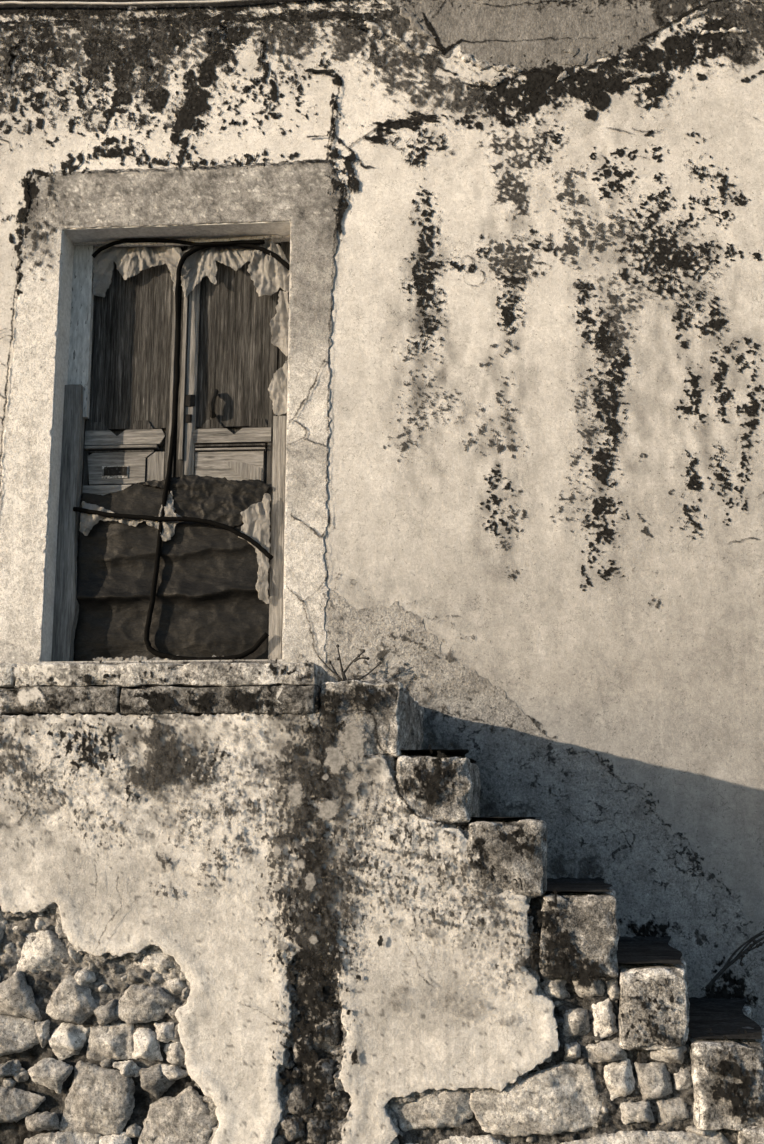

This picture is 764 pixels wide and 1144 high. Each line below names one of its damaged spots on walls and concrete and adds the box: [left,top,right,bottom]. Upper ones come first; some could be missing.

damp [0,6,278,148]
crack [0,0,724,88]
damp [673,2,764,82]
crack [0,70,400,656]
flaking render [320,573,764,1028]
damp [0,654,764,1144]
flaking render [275,951,351,1144]
flaking render [388,951,738,1144]